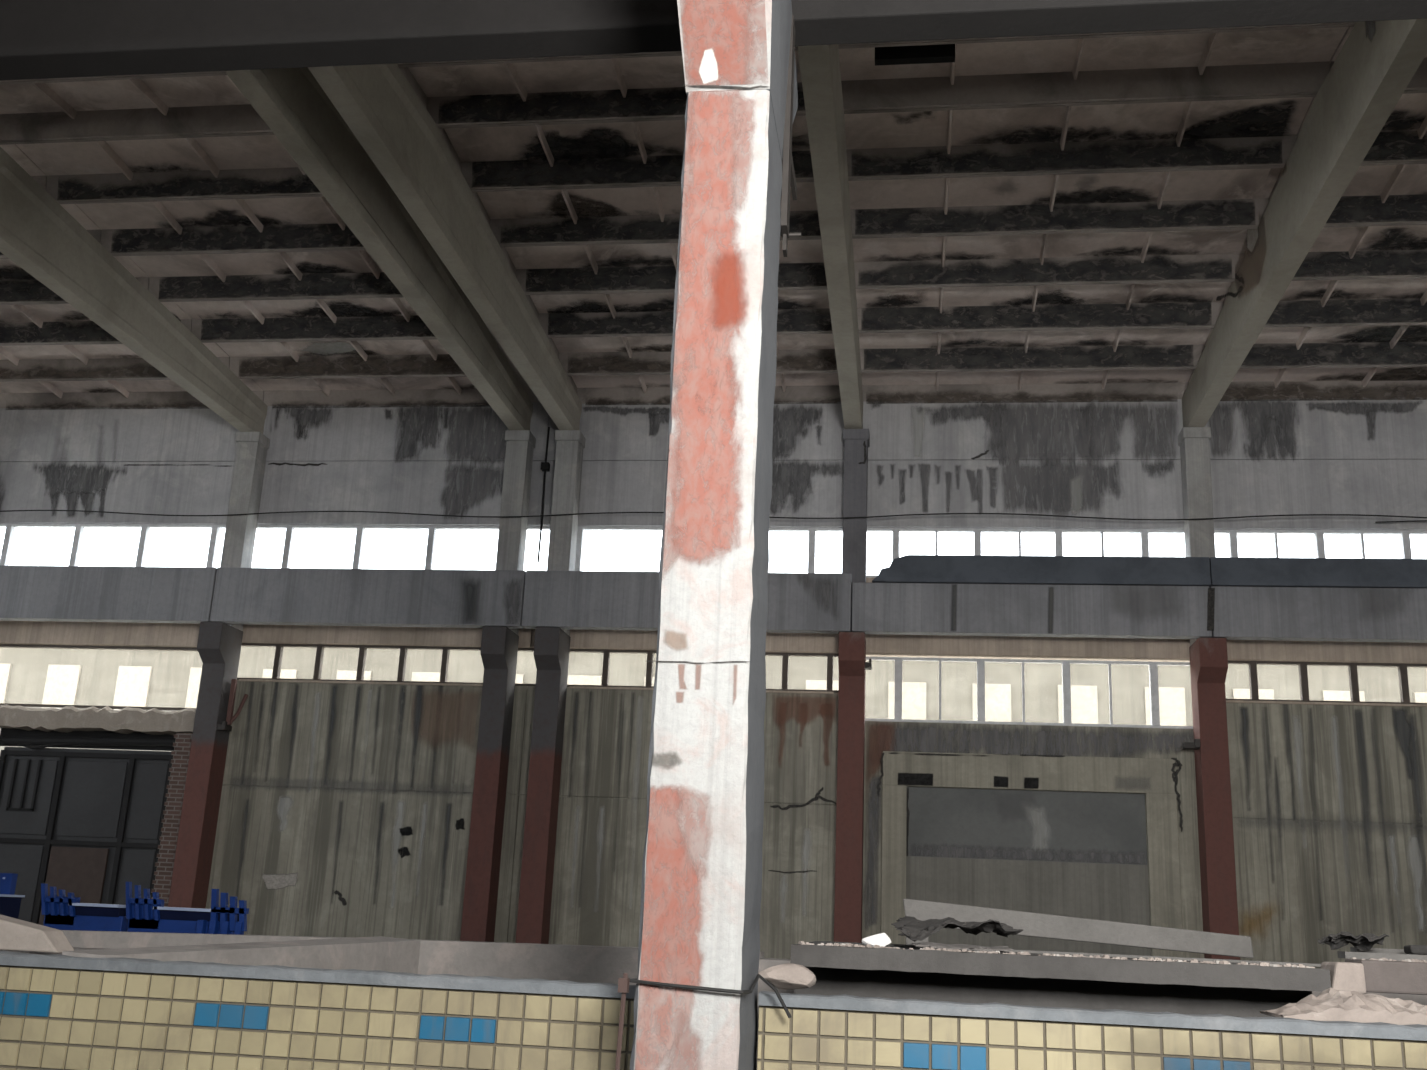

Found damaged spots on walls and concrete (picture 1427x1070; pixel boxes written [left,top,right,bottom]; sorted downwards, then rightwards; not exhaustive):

damp [0,252,210,410]
damp [58,165,508,517]
peeling [663,0,767,571]
damp [859,247,1232,514]
damp [855,189,1255,235]
damp [852,101,1295,176]
damp [1210,194,1427,460]
damp [1364,111,1427,161]
damp [35,464,127,517]
crack [771,787,836,810]
crack [877,753,1065,856]
peeling [635,787,709,1070]